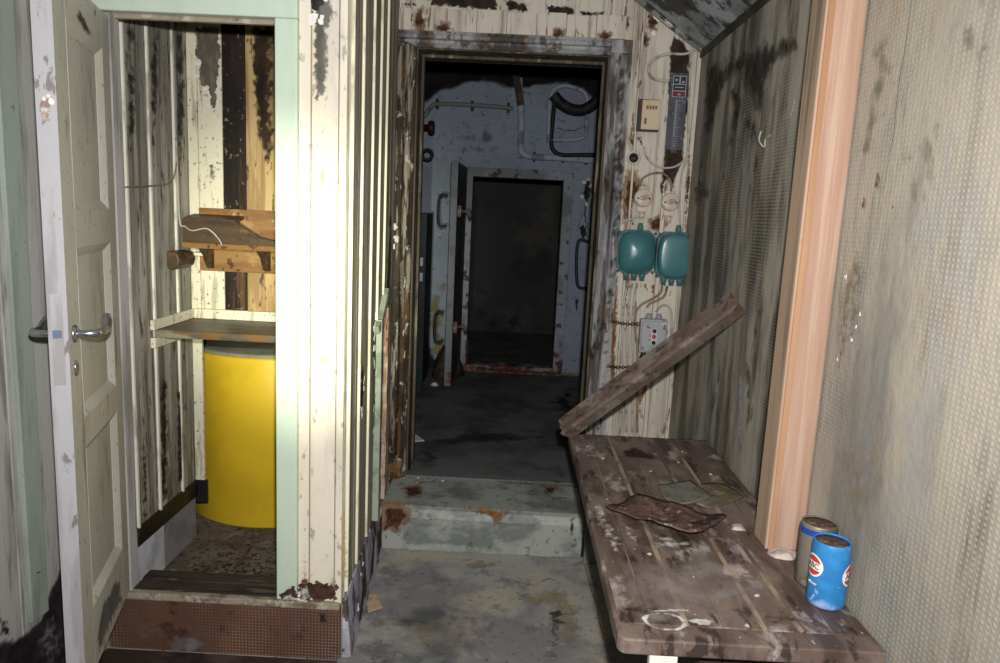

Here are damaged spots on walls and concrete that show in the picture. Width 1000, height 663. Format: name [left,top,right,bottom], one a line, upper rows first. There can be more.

peeling [307,0,328,26]
corrosion [415,8,450,31]
peeling [195,23,221,120]
leakage [705,40,796,152]
corrosion [622,171,640,225]
corrosion [380,460,422,538]
corrosion [469,507,506,526]